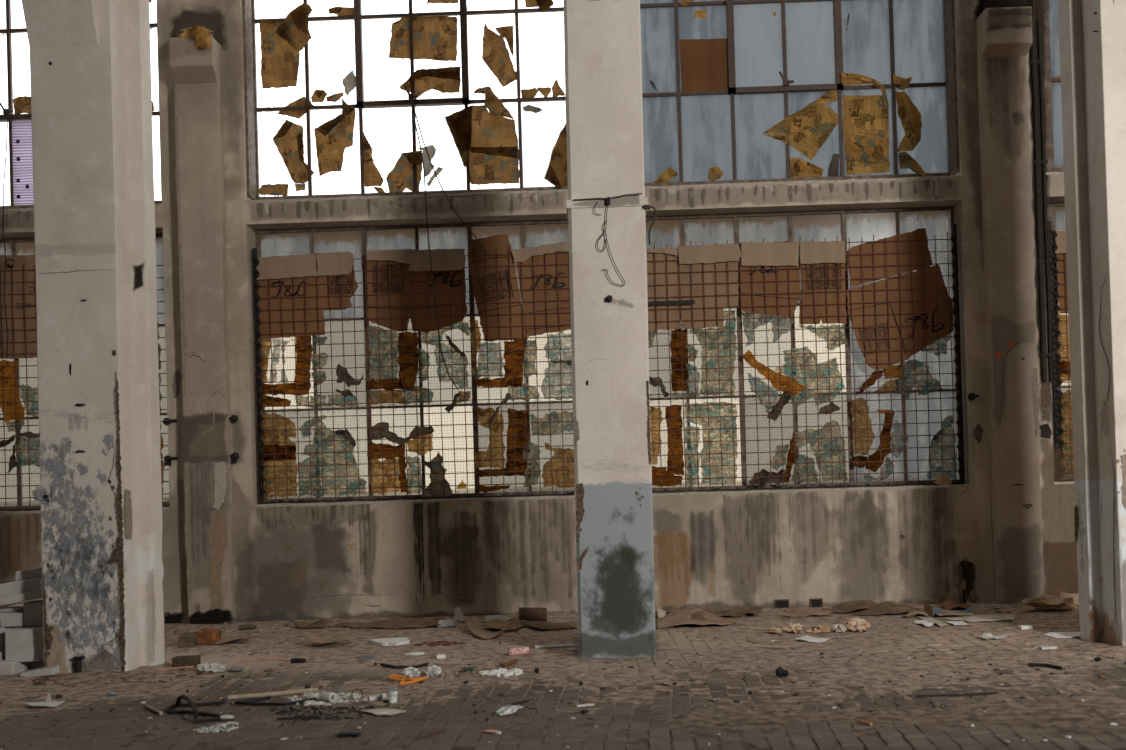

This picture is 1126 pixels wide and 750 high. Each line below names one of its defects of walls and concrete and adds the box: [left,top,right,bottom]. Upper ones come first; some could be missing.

damp [183,414,228,462]
spalling [1117,449,1126,508]
peeling [32,375,133,672]
damp [413,503,424,603]
damp [591,547,649,636]